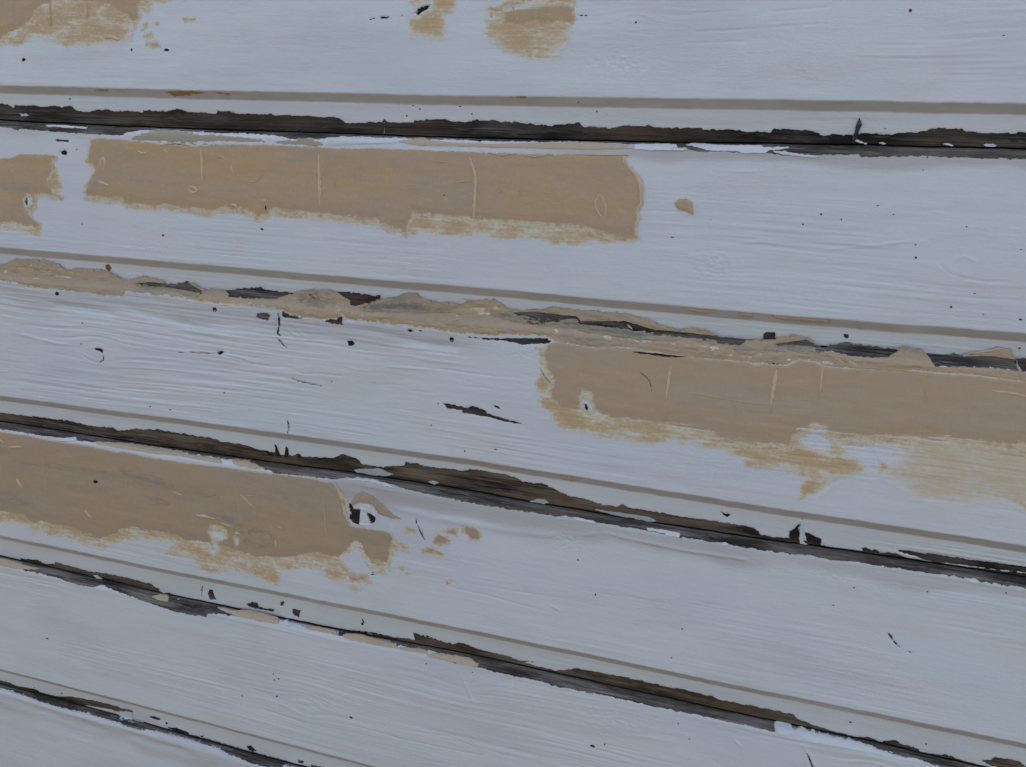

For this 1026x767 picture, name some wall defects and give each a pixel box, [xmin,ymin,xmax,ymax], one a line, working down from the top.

peeling [0,98,1026,170]
peeling [137,281,202,294]
peeling [226,287,293,299]
peeling [338,292,381,308]
peeling [469,337,550,345]
peeling [514,312,747,346]
peeling [763,332,897,358]
peeling [926,347,1026,372]
peeling [0,413,1026,594]
peeling [20,558,234,617]
peeling [338,630,1025,767]
peeling [0,680,321,767]